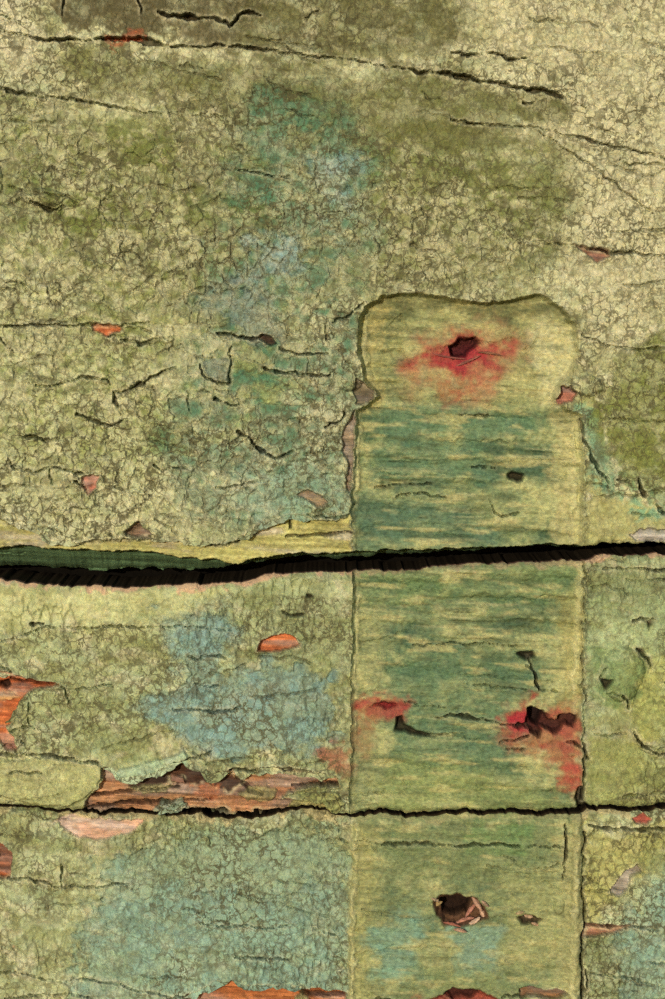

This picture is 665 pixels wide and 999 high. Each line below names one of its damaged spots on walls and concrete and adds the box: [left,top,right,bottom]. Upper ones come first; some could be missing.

crack [0,0,665,213]
crack [500,238,665,257]
crack [0,302,367,490]
crack [7,459,152,546]
peeling [0,488,354,571]
crack [206,514,349,547]
crack [578,417,665,515]
peeling [629,527,665,543]
peeling [0,670,340,841]
spalling [394,715,437,739]
spalling [439,894,471,915]
peeling [184,980,347,999]